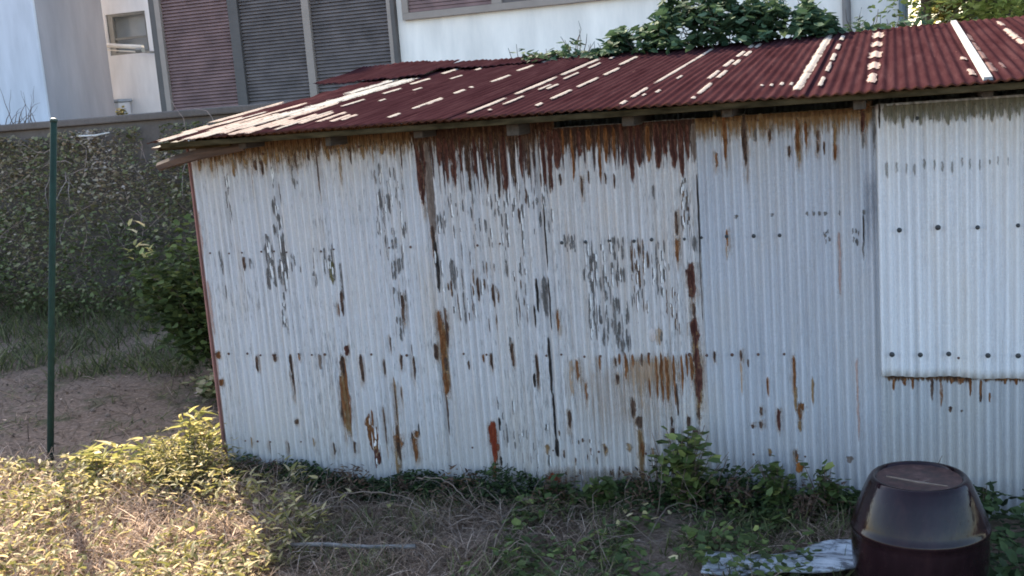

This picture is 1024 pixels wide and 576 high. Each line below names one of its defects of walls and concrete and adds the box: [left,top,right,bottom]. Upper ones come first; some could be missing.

rust [339,337,420,473]
peeling [373,164,407,341]
rust [433,311,451,434]
peeling [434,182,554,331]
rust [488,422,500,480]
rust [194,103,873,293]
peeling [563,234,680,356]
rust [614,212,704,480]
peeling [680,178,697,250]
rust [792,357,814,431]
rust [885,376,1024,413]